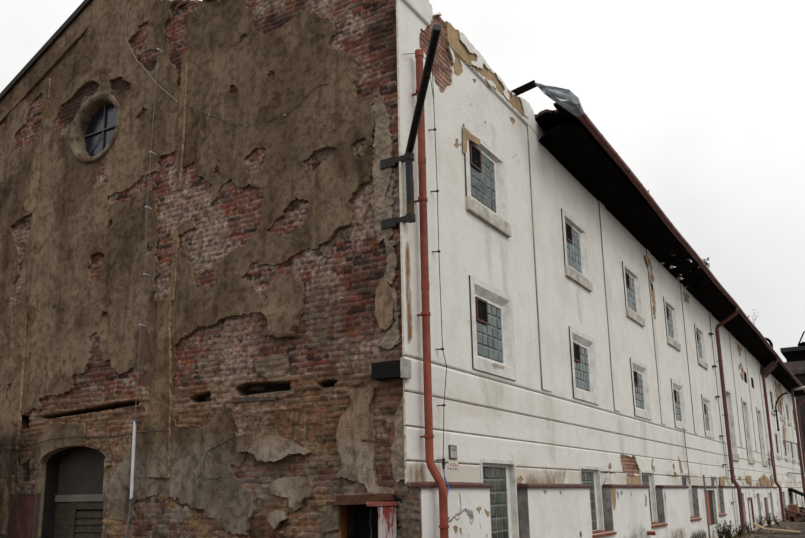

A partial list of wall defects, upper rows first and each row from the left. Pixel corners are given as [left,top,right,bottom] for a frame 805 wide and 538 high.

spalling [419,15,529,124]
spalling [55,82,100,137]
spalling [454,126,480,153]
spalling [103,0,422,538]
spalling [645,255,656,319]
spalling [14,332,150,494]
spalling [619,453,641,497]
peeling [448,493,490,534]